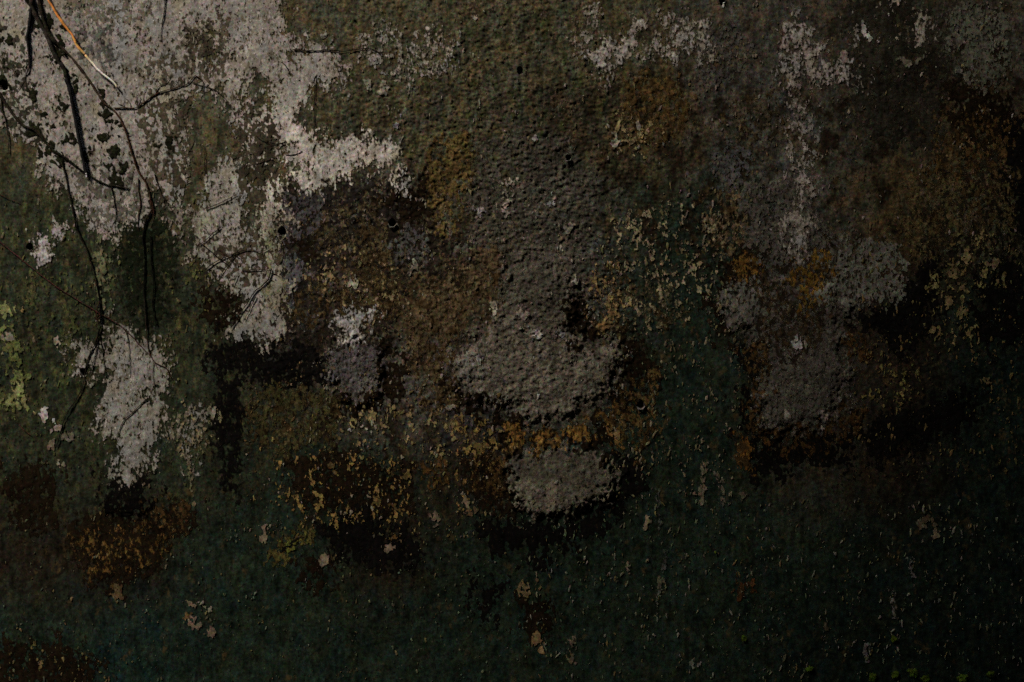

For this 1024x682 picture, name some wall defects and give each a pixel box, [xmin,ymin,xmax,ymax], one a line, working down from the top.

peeling [0,0,518,553]
peeling [81,520,174,603]